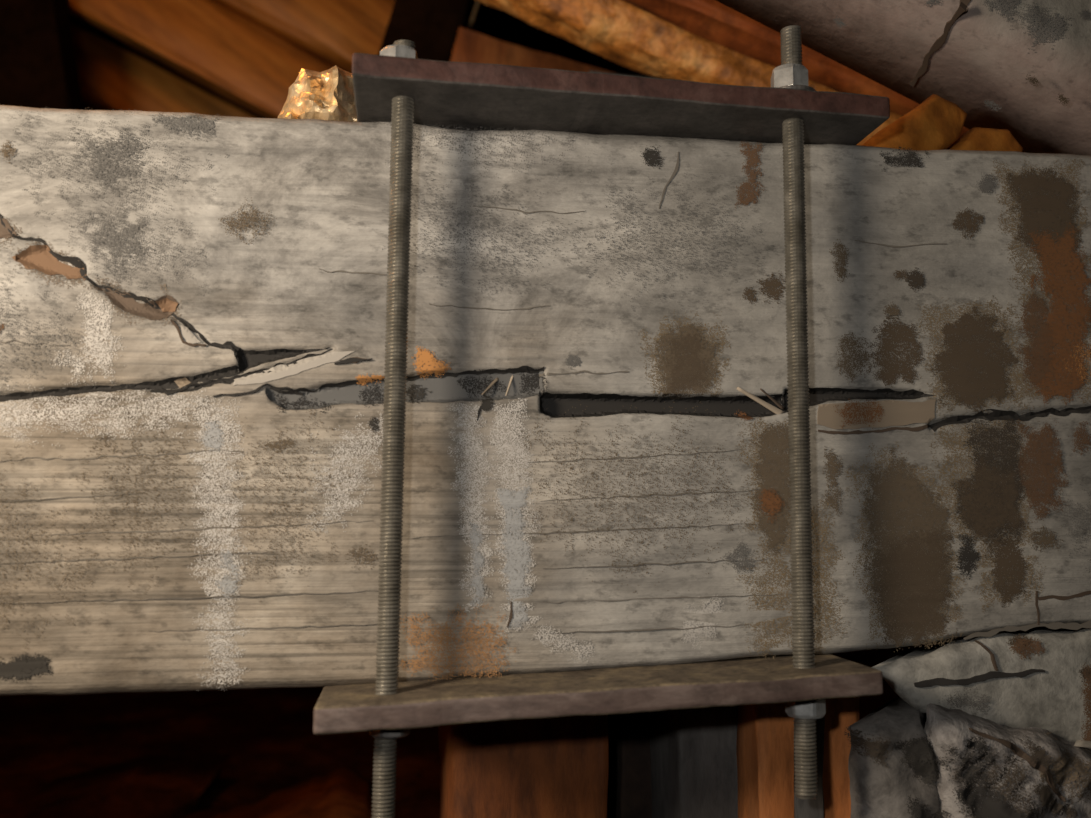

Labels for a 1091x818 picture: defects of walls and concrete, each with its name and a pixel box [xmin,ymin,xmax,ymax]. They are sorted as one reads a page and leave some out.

crack [909,0,970,87]
crack [0,214,1091,435]
water stain [0,106,385,691]
water stain [406,384,432,403]
rust [1016,419,1091,523]
crack [1,521,364,564]
crack [412,523,743,539]
crack [6,591,363,604]
crack [153,624,375,632]
crack [546,624,748,634]
crack [1035,591,1091,625]
crack [914,640,1045,687]